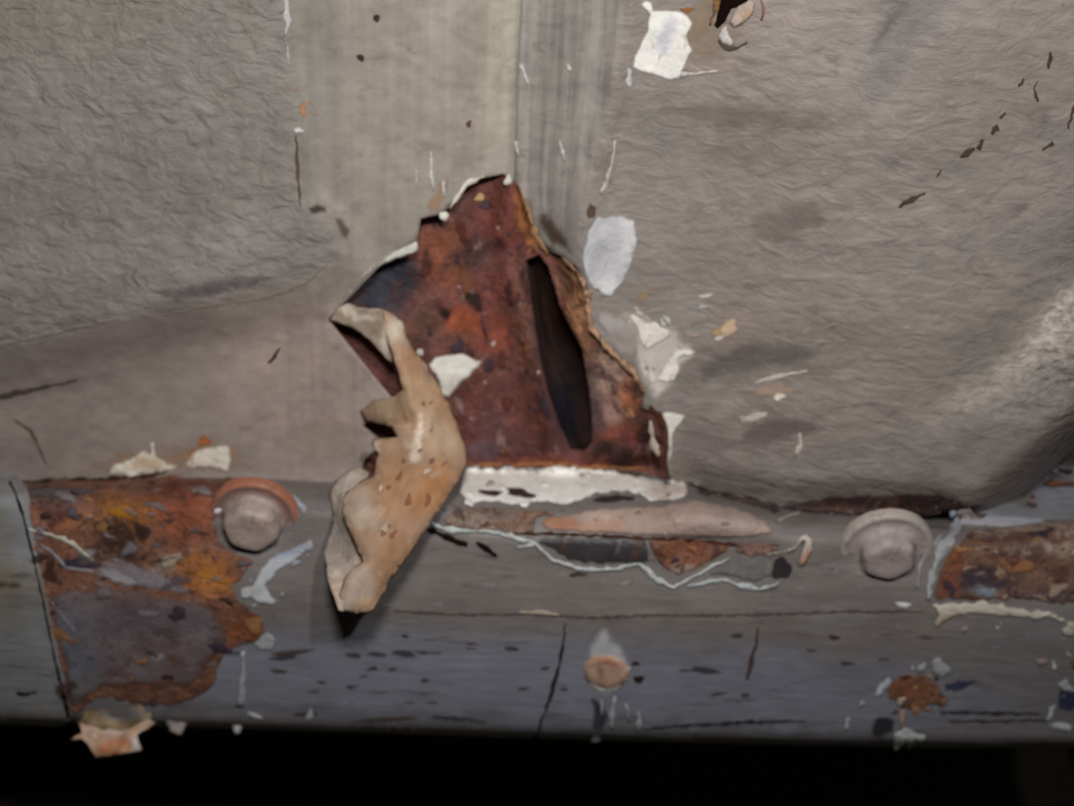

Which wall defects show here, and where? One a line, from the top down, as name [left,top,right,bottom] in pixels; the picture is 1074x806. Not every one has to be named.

crack [283,0,292,65]
peeling [626,2,718,87]
peeling [730,1,755,27]
crack [0,380,77,465]
peeling [110,435,235,477]
rust [466,461,647,472]
peeling [324,242,812,614]
rust [9,471,313,733]
rust [698,489,1074,667]
peeling [70,703,187,758]
crack [534,624,566,738]
rust [858,658,974,749]